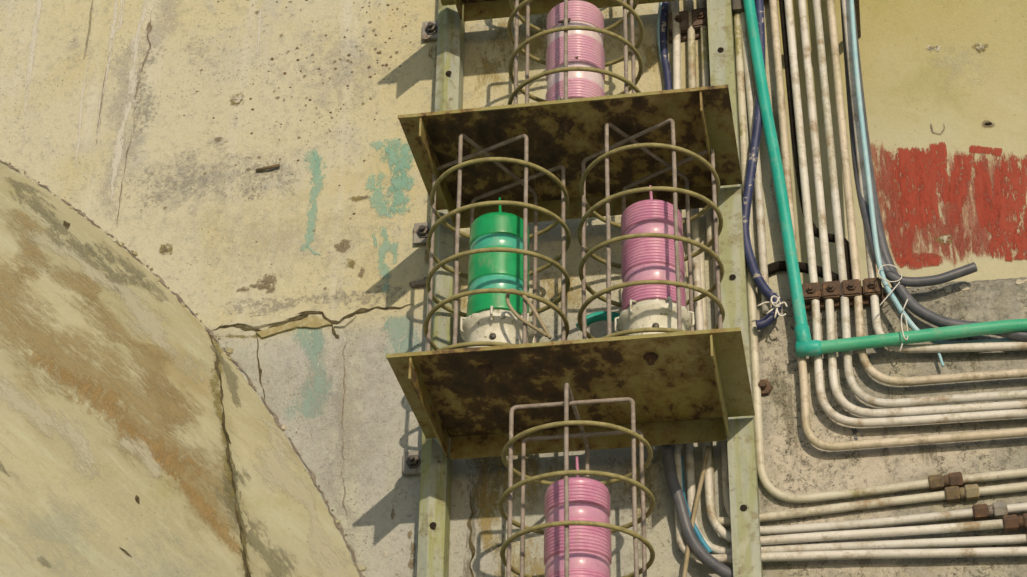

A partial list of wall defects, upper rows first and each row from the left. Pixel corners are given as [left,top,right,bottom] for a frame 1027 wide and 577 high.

crack [110,0,155,220]
crack [208,304,415,577]